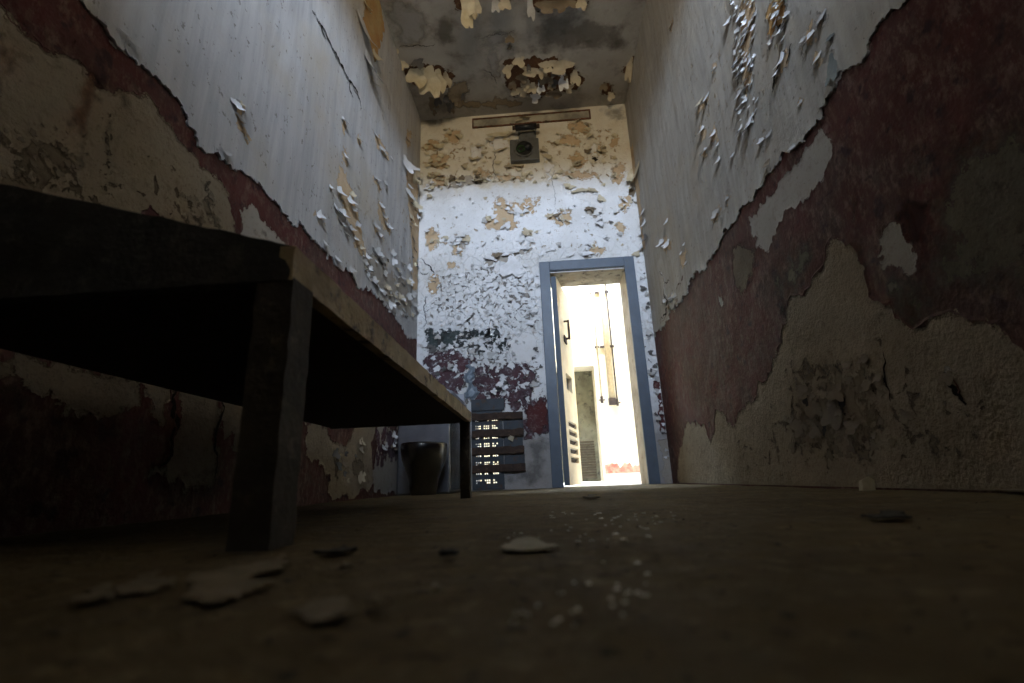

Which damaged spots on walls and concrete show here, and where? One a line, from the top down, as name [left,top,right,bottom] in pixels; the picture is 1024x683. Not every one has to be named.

crack [312,10,362,109]
peeling [0,0,1024,501]